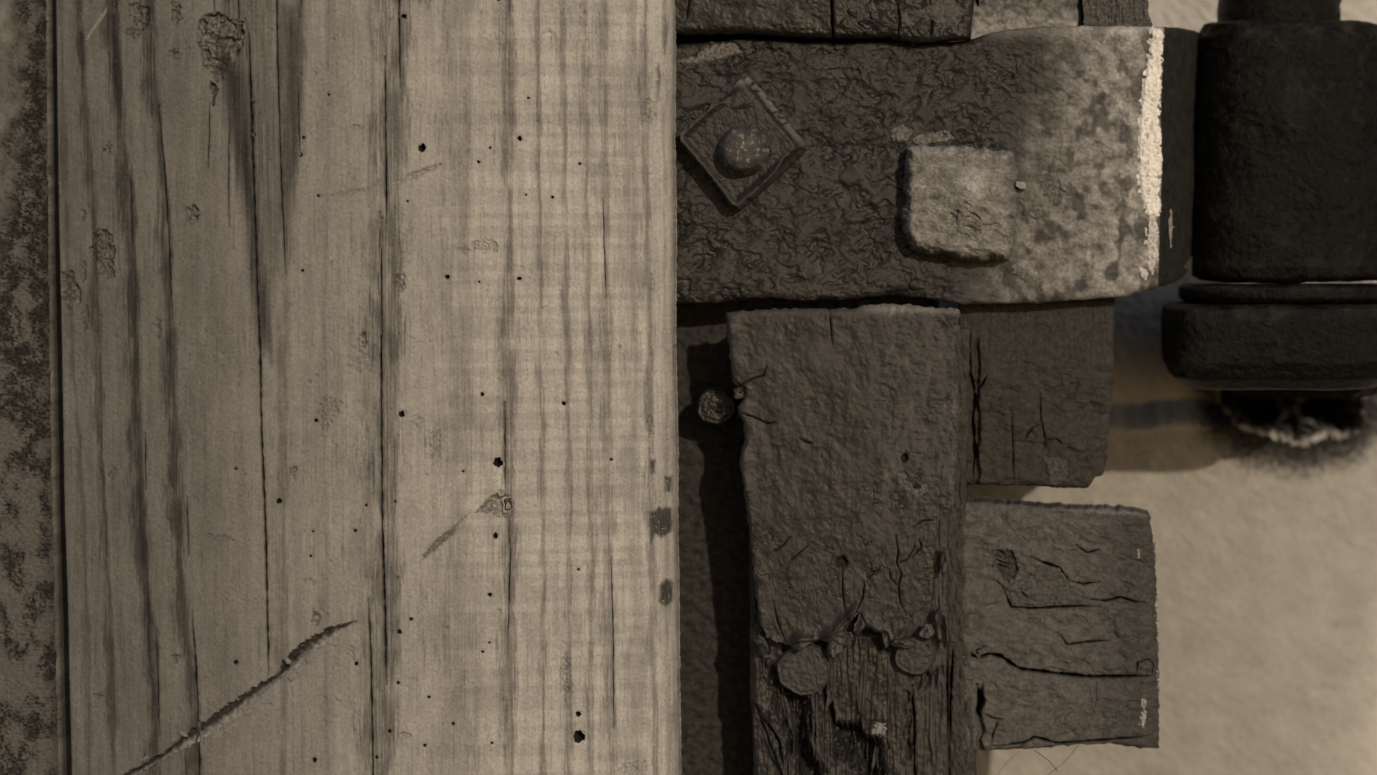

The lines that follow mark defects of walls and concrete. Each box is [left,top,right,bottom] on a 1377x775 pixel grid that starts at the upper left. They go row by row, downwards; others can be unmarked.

peeling [726,266,961,660]
crack [154,629,162,737]
crack [190,611,202,775]
crack [911,545,1156,775]